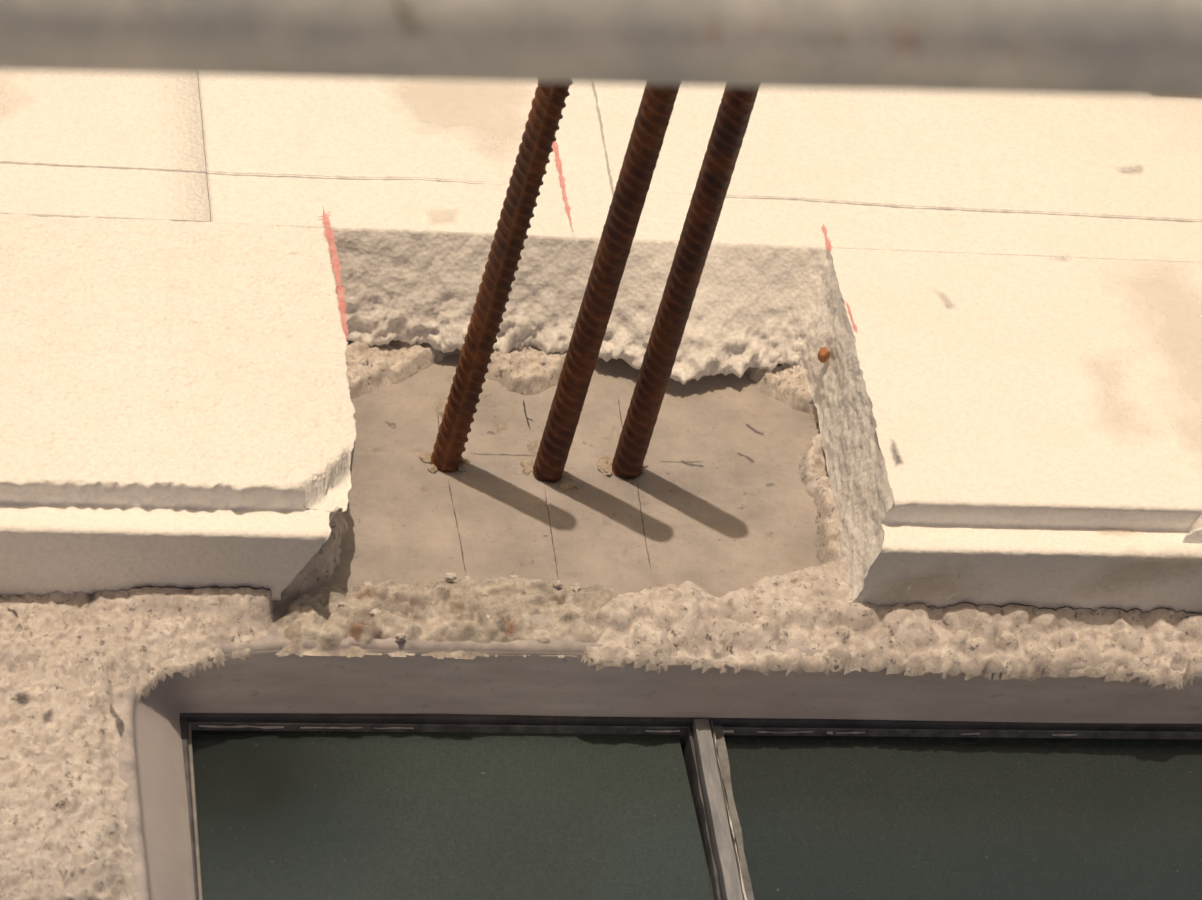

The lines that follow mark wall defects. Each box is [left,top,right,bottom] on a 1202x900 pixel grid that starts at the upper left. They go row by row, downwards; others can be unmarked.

spalling [274,572,616,659]
spalling [346,82,680,481]
spalling [612,86,759,477]
flaking render [745,363,841,564]